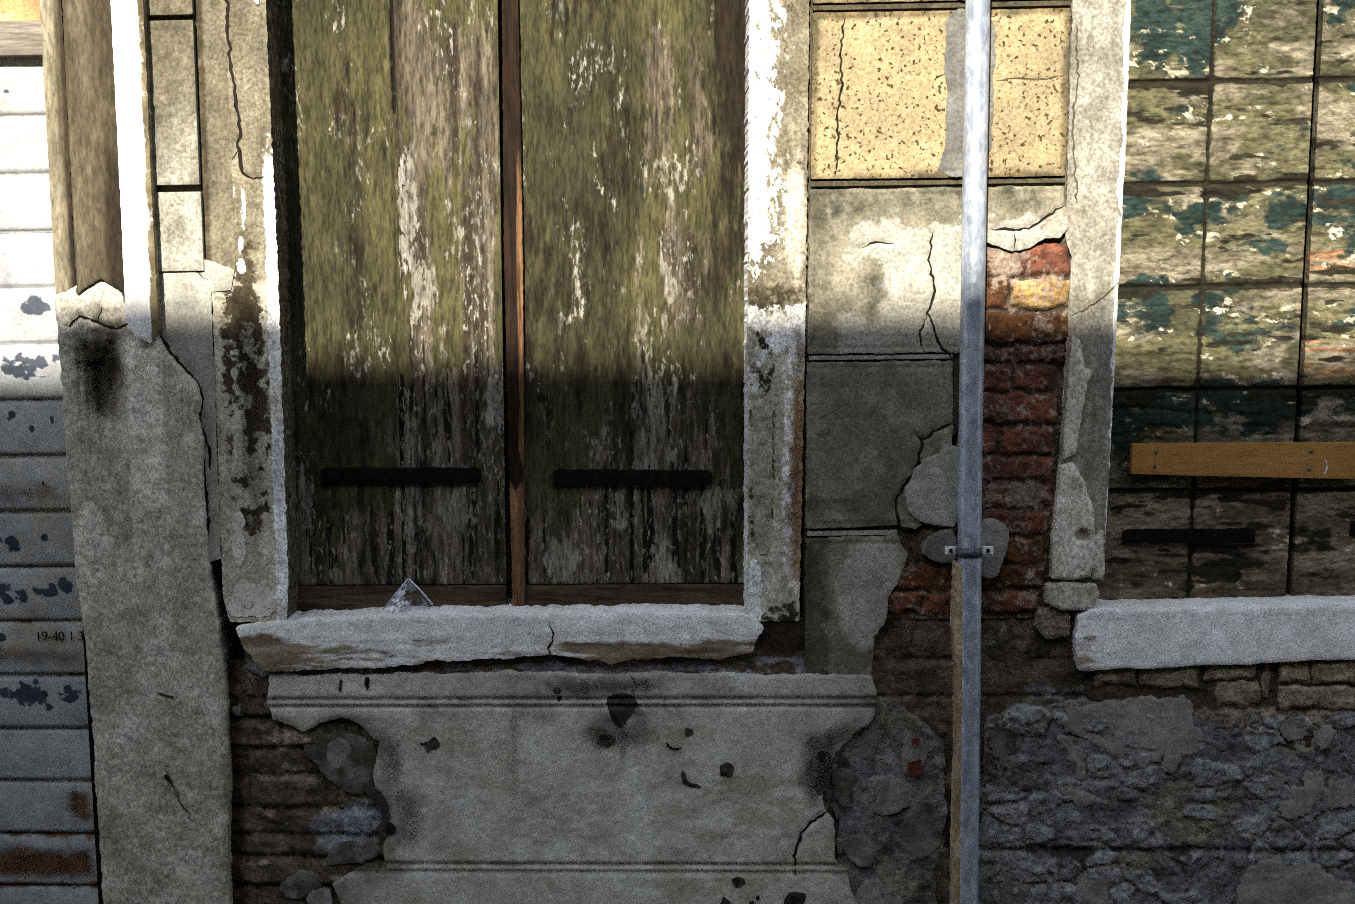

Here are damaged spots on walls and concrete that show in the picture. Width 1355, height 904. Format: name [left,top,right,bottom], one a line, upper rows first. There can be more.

crack [224,0,264,179]
crack [835,0,848,175]
water stain [81,339,117,413]
flaking render [886,410,959,619]
crack [919,233,954,361]
flaking render [981,242,1071,619]
flaking render [227,652,396,904]
crack [792,811,828,875]
flaking render [816,695,948,904]